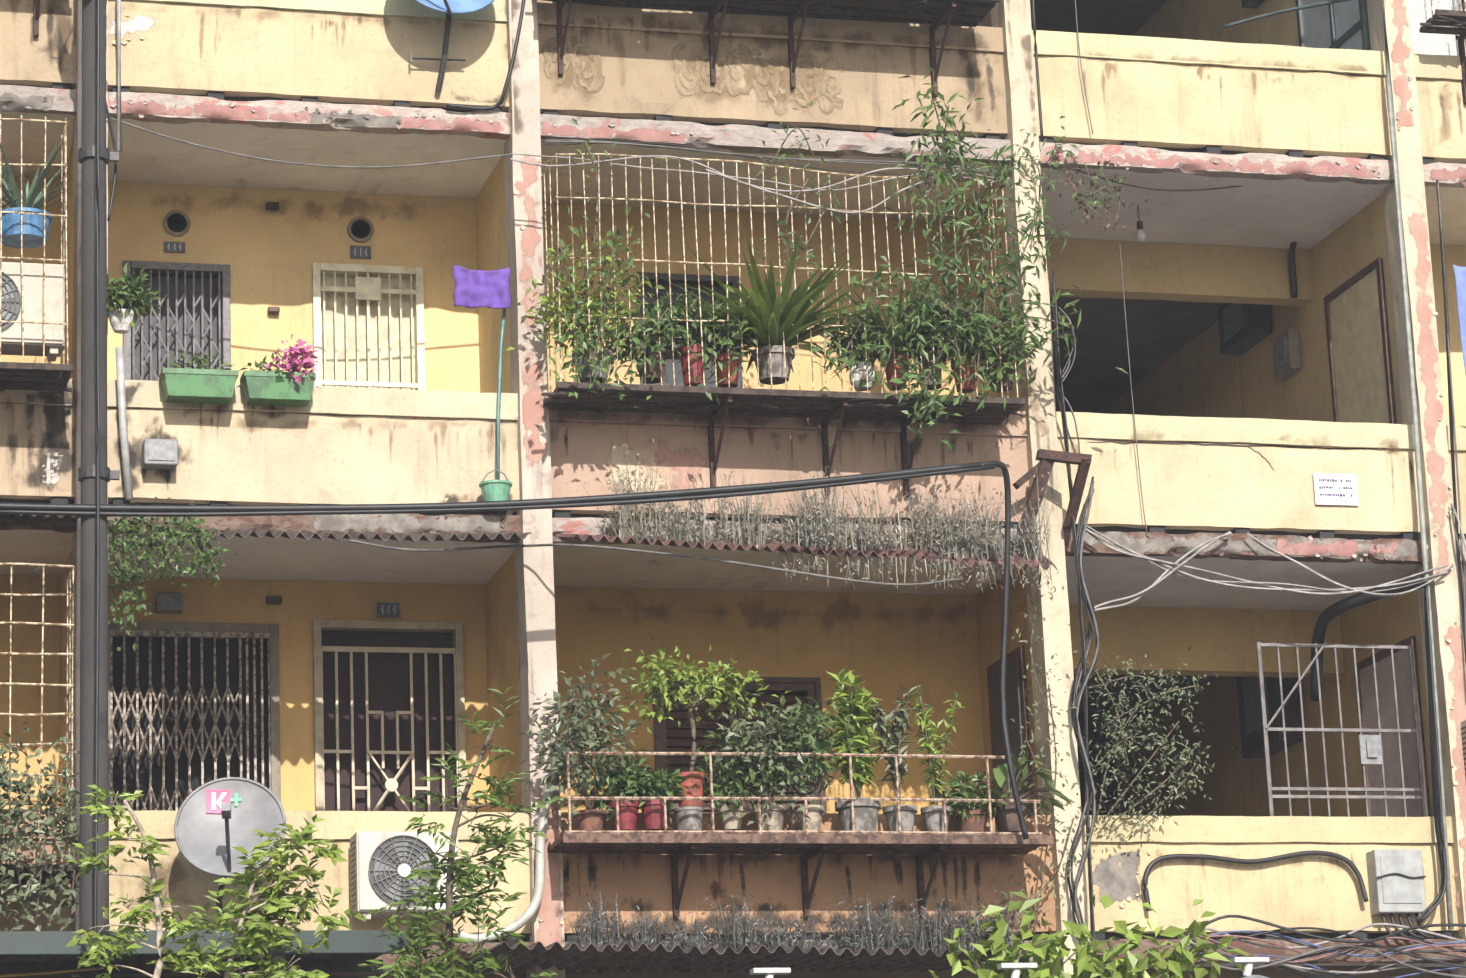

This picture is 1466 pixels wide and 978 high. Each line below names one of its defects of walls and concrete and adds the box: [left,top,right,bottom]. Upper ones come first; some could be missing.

damp [32,9,62,66]
damp [967,67,994,99]
peeling [1385,0,1414,130]
peeling [110,95,500,133]
peeling [1084,213,1452,577]
damp [9,387,77,490]
peeling [650,441,705,490]
damp [559,859,1036,948]
peeling [1092,851,1142,908]